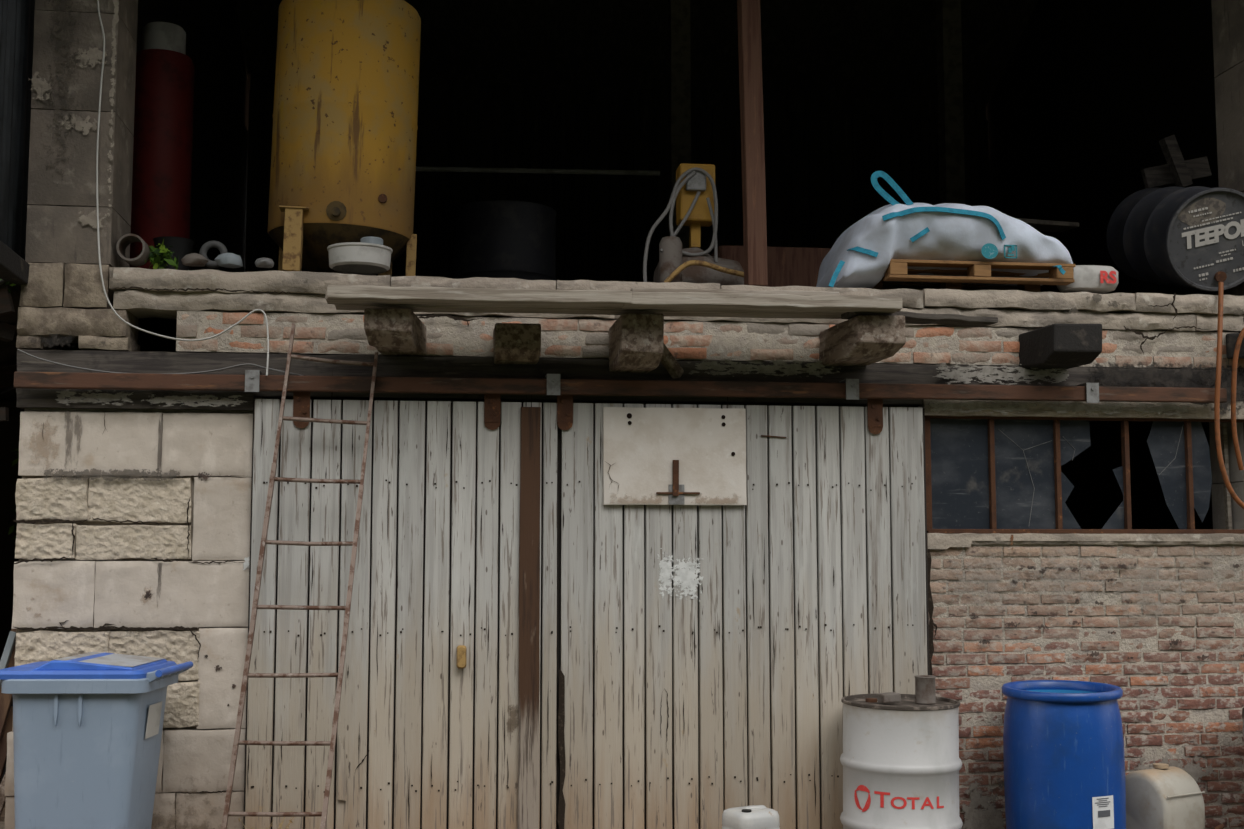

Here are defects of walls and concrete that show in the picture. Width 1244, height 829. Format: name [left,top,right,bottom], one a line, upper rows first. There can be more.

leakage [106,0,119,229]
crack [1124,294,1209,354]
peeling [657,548,703,602]
spalling [1012,563,1136,584]
spalling [1031,599,1081,630]
peeling [1134,751,1218,787]
peeling [962,781,1006,829]